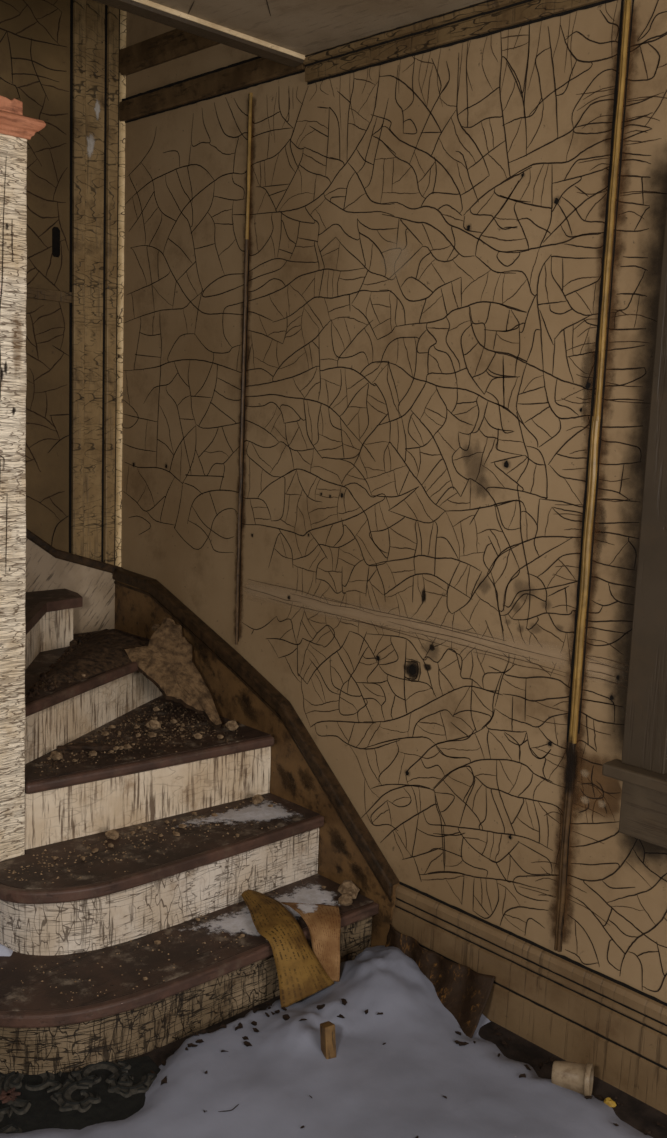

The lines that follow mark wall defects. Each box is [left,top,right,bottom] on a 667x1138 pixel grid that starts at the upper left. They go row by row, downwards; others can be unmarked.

crack [122,0,667,992]